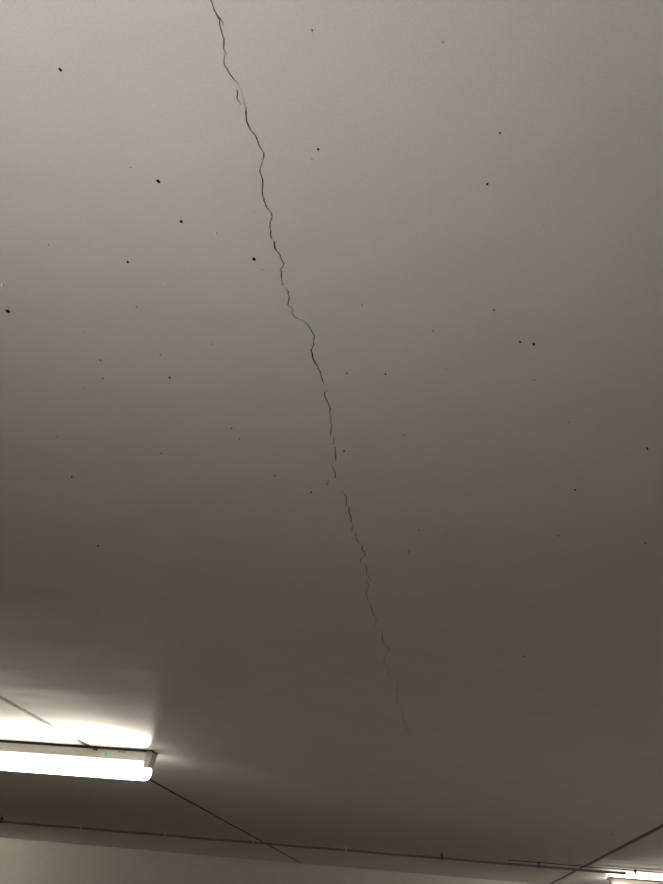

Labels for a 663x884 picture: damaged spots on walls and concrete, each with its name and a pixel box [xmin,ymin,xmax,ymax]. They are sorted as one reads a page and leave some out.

crack [210,0,374,615]